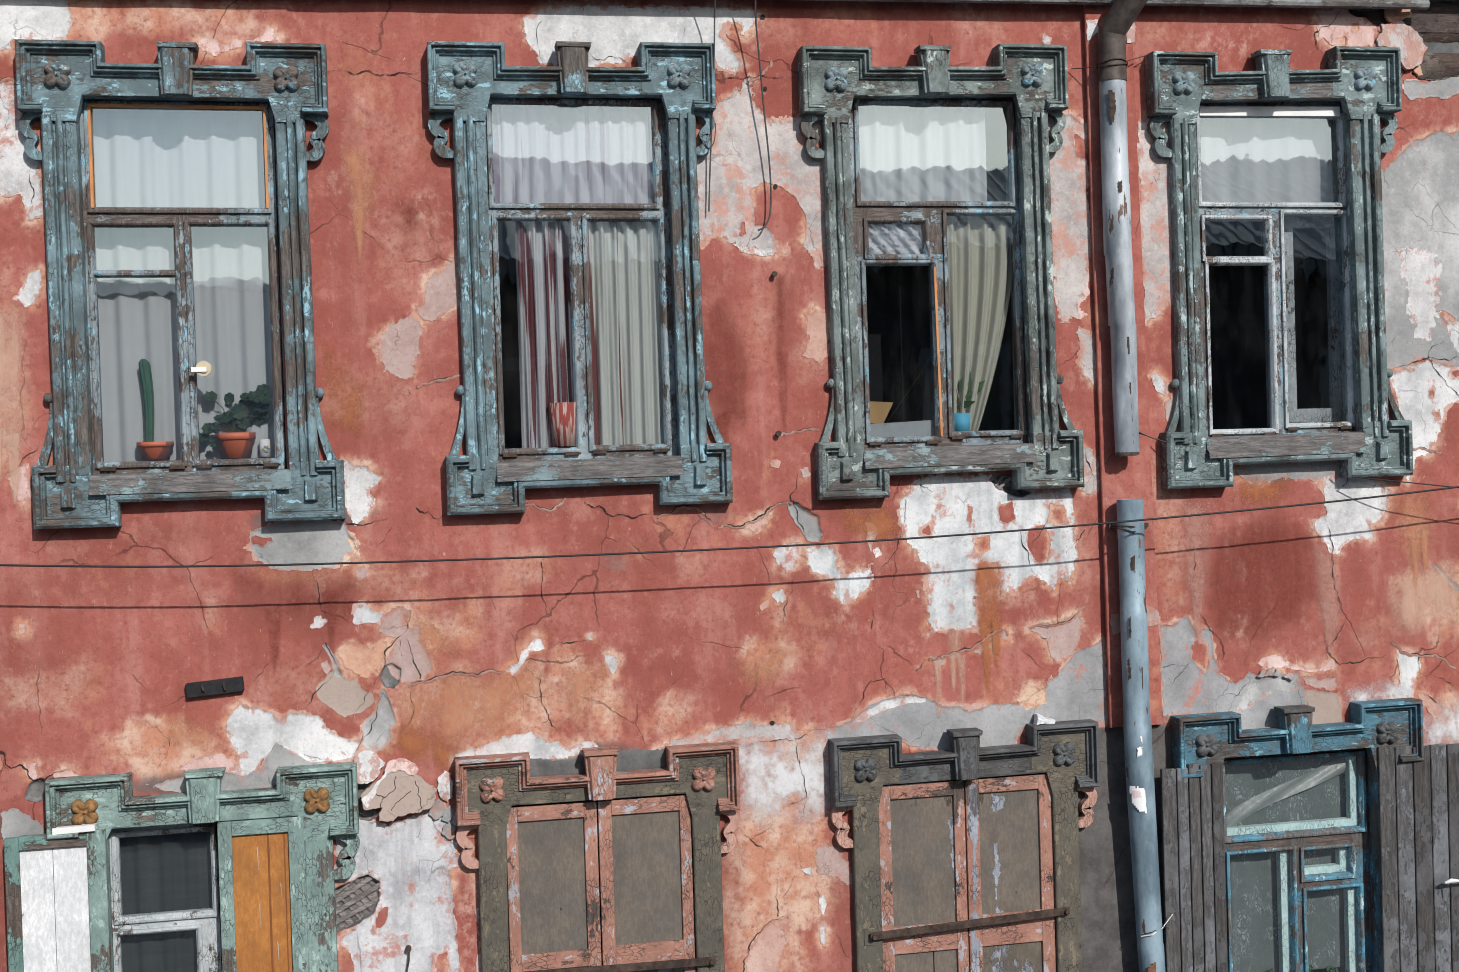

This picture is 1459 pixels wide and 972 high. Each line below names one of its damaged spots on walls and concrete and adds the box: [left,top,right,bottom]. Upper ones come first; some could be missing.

flaking render [0,0,73,50]
flaking render [0,79,44,221]
flaking render [522,0,827,270]
flaking render [1381,129,1459,482]
crack [255,562,590,759]
flaking render [896,445,1100,655]
flaking render [1146,605,1343,730]
flaking render [1234,460,1392,554]
crack [1324,516,1458,709]
flaking render [334,782,482,972]
crack [376,777,443,842]
flaking render [744,918,790,972]